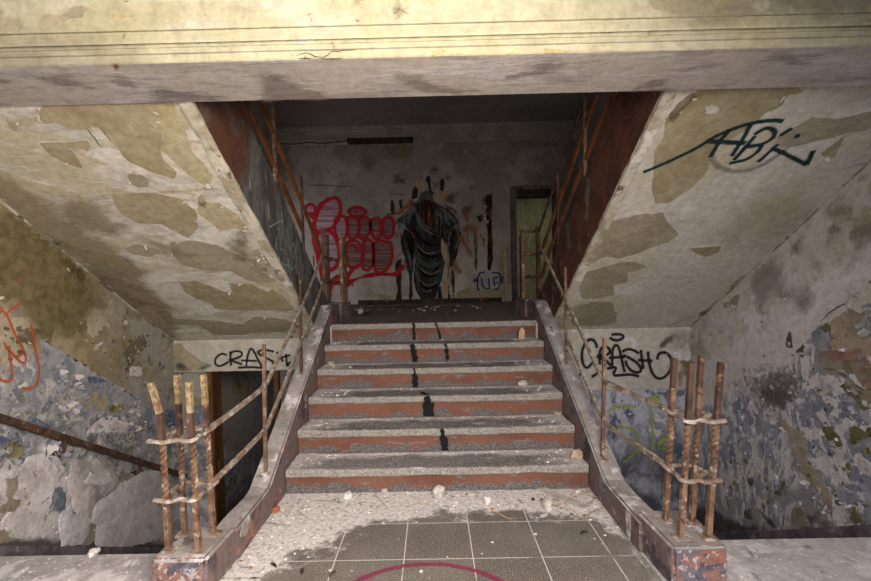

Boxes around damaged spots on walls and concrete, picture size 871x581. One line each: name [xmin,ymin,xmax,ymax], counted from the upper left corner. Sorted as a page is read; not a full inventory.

water stain [0,179,175,338]
peeling [35,102,303,335]
crack [296,50,350,59]
peeling [570,87,802,335]
peeling [777,112,871,162]
peeling [0,296,208,546]
mould [744,367,806,414]
peeling [718,280,871,528]